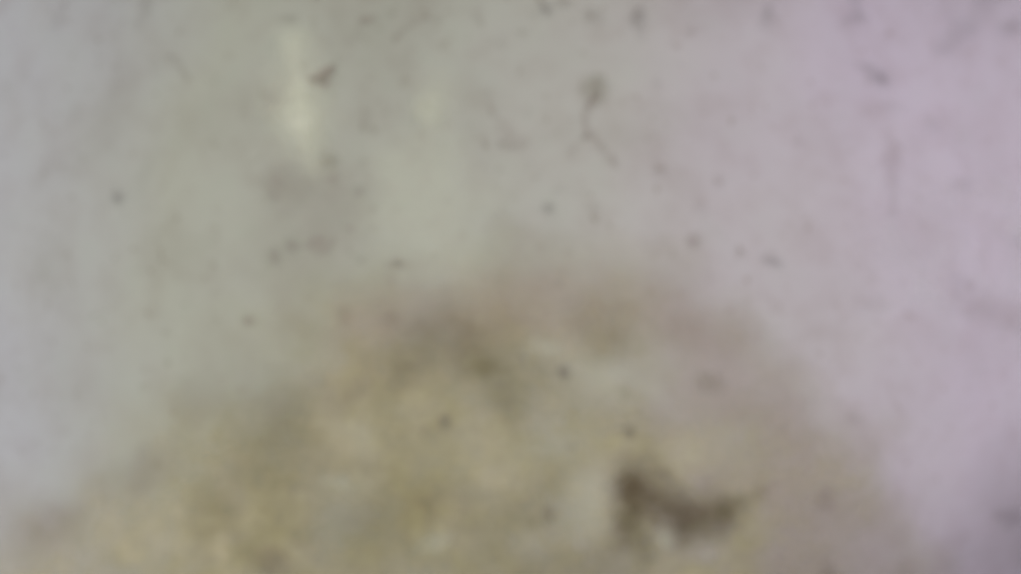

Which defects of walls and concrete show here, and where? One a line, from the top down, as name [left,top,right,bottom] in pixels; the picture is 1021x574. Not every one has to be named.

water stain [99,300,850,574]